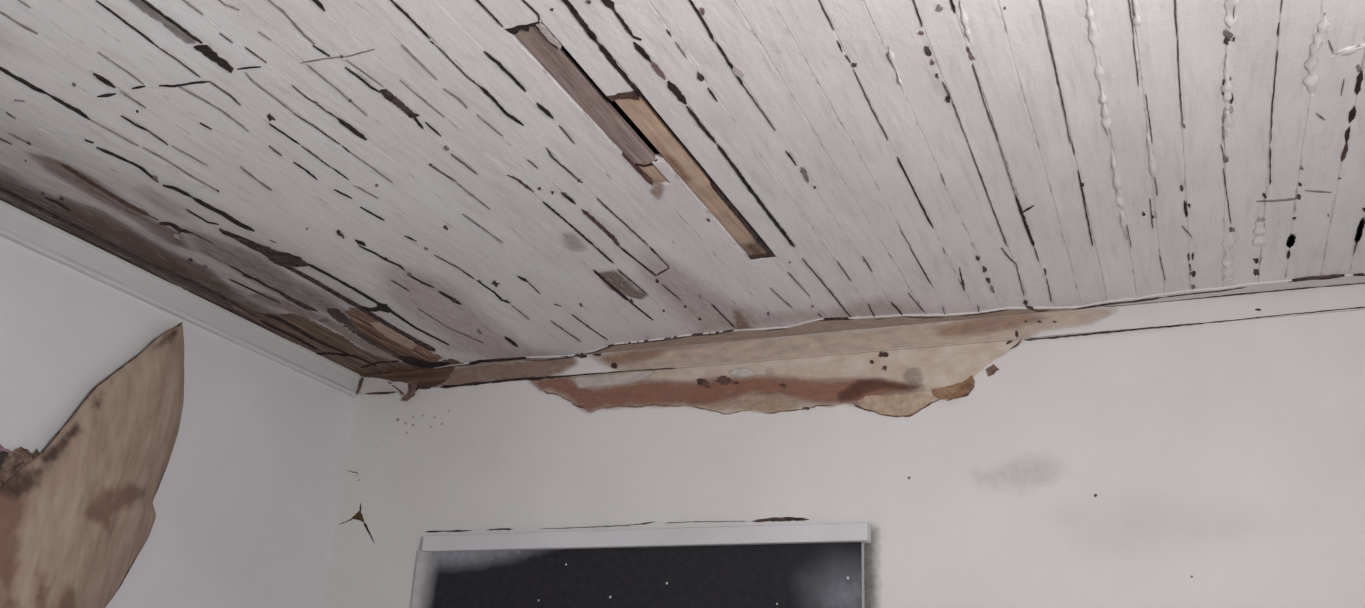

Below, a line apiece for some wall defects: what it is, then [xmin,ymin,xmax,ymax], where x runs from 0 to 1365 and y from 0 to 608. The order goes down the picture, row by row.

spalling [505,21,562,49]
spalling [607,90,640,101]
spalling [622,151,662,198]
spalling [712,181,776,260]
water stain [0,157,397,361]
peeling [600,271,646,299]
peeling [696,376,739,388]
peeling [857,393,934,416]